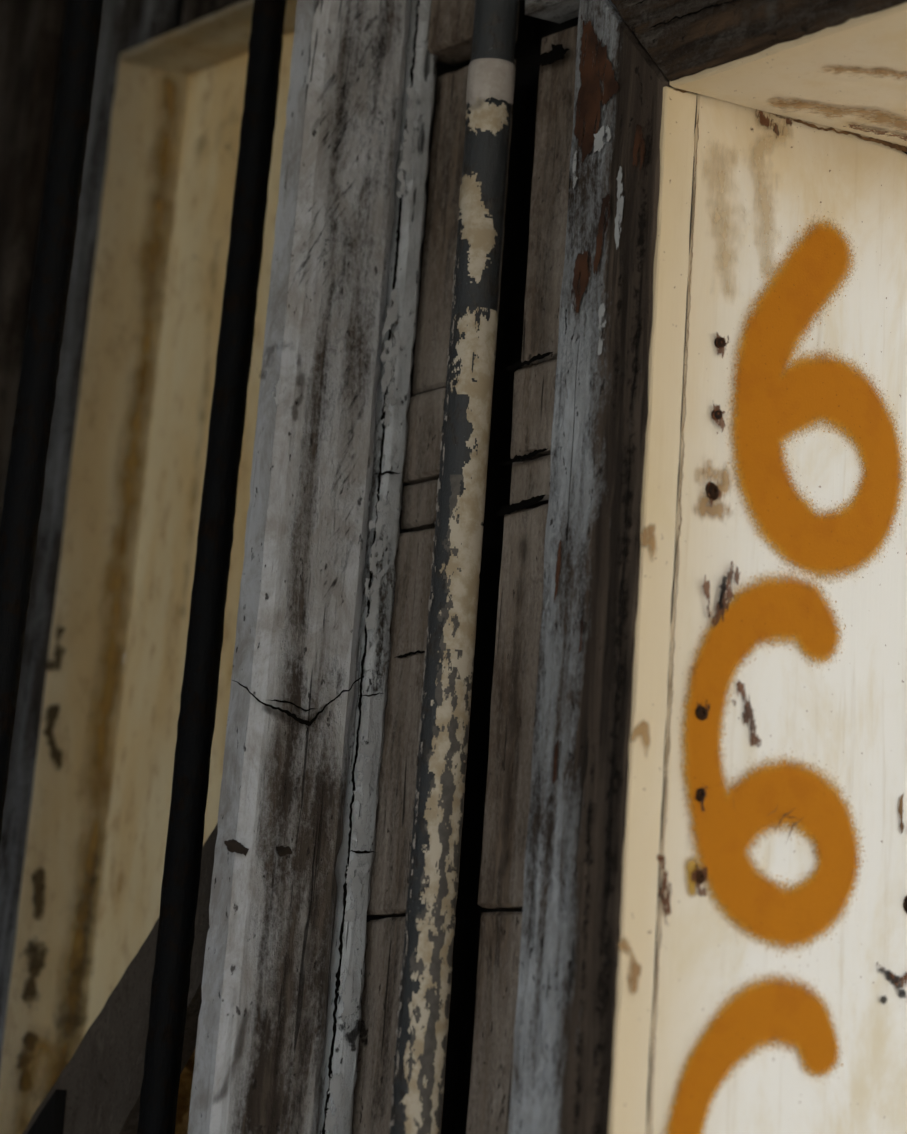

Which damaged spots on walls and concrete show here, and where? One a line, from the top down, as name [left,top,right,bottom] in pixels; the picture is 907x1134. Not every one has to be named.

crack [387,0,420,354]
peeling [465,97,509,136]
crack [235,386,403,1134]
crack [394,650,425,658]
peeling [389,171,498,1134]